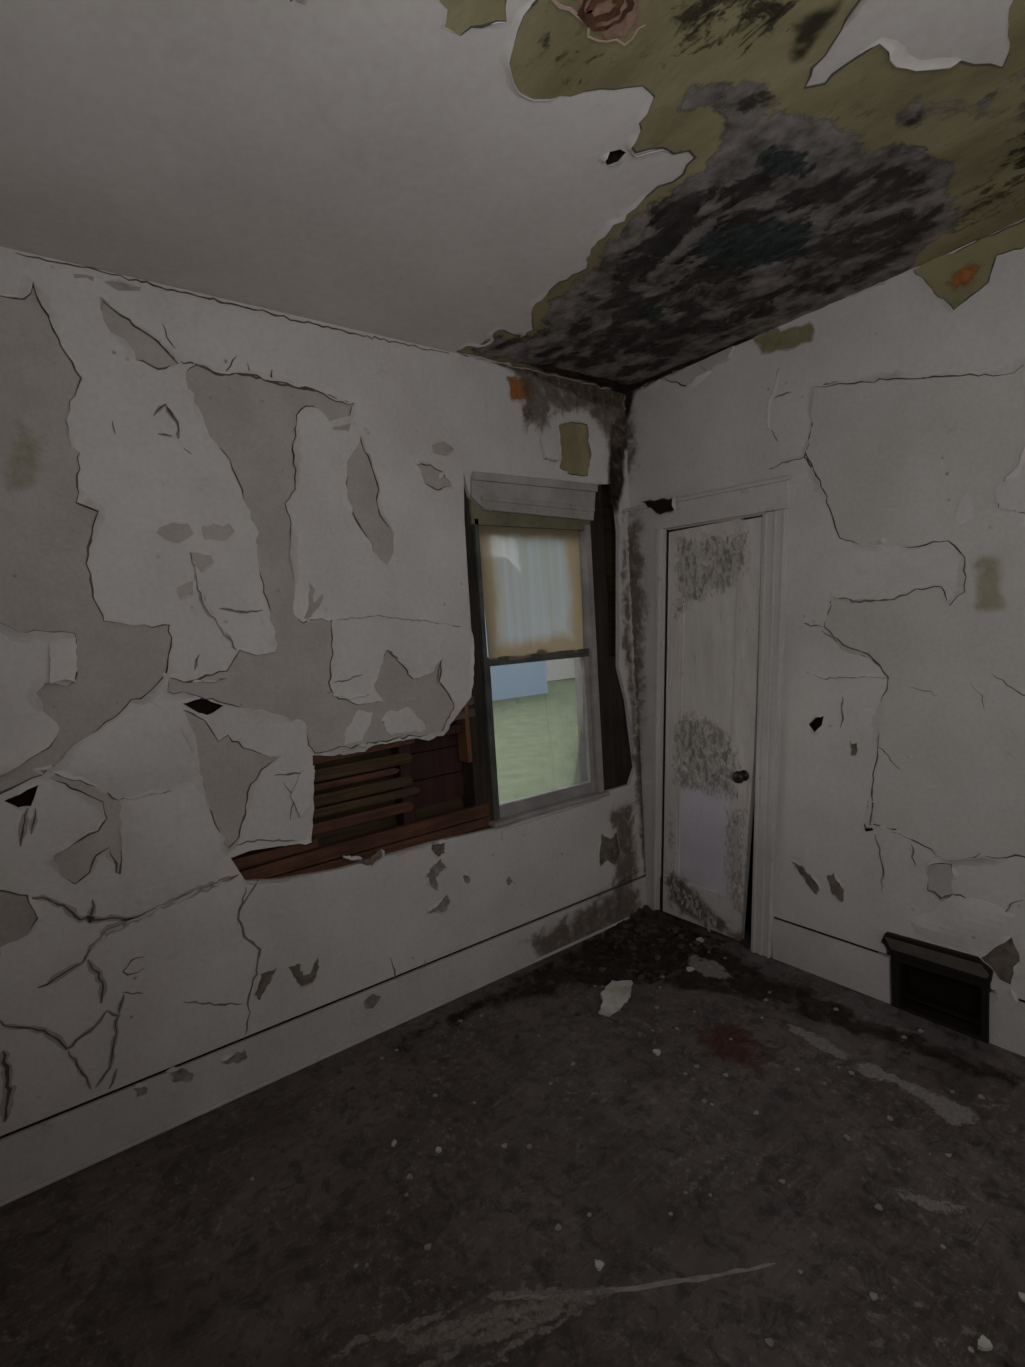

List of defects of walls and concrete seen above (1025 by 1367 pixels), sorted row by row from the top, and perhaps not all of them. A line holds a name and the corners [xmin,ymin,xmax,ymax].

corrosion [551,0,646,47]
damp [671,0,836,60]
peeling [440,0,1025,395]
peeling [0,271,475,885]
peeling [556,418,604,484]
damp [461,73,1025,956]
crack [803,592,934,770]
peeling [805,356,1025,902]
crack [970,673,1025,711]
crack [866,825,915,890]
crack [0,772,301,1122]
spalling [977,936,1020,984]